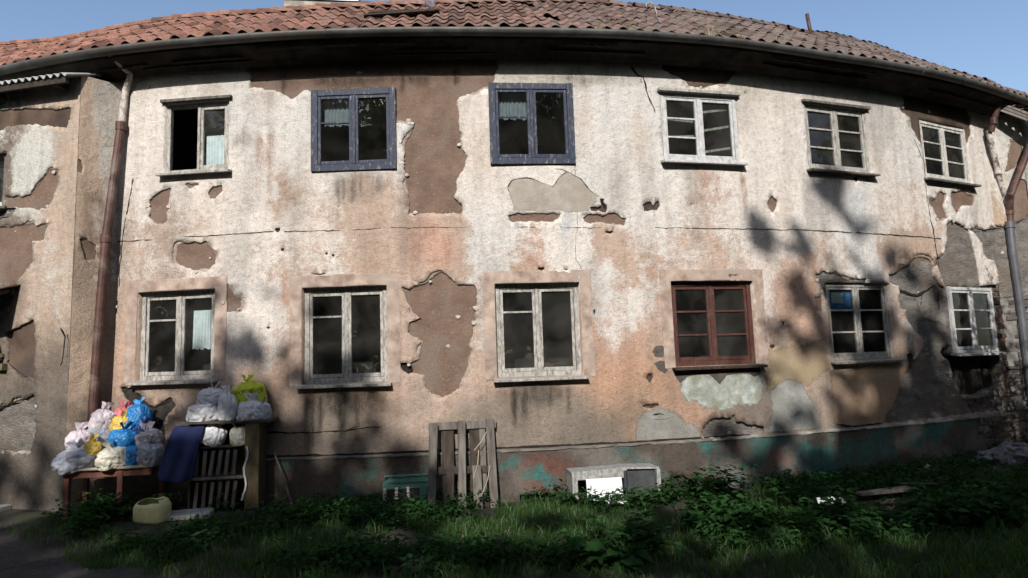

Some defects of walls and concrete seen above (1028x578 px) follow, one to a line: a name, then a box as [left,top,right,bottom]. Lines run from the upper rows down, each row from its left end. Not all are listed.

crack [631,66,656,113]
flaking render [0,107,71,131]
flaking render [246,60,498,217]
flaking render [900,96,970,150]
flaking render [0,167,60,289]
flaking render [144,188,171,224]
flaking render [508,213,560,222]
flaking render [583,199,626,234]
flaking render [173,239,219,273]
flaking render [401,270,479,398]
spalling [884,179,1028,449]
peeling [680,373,764,438]